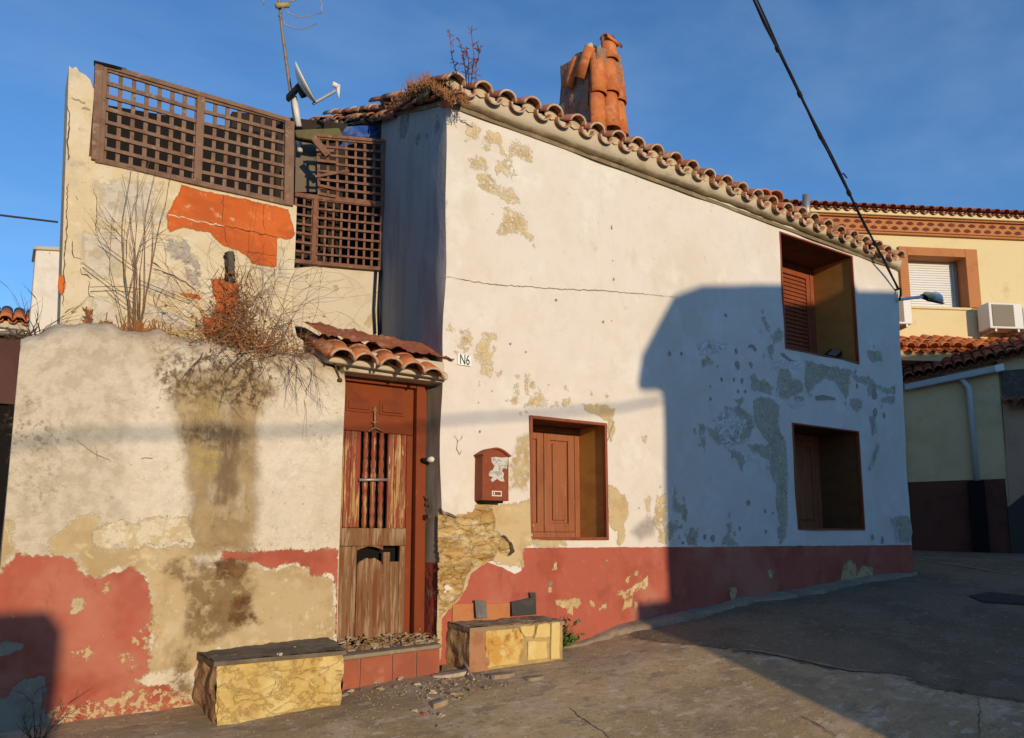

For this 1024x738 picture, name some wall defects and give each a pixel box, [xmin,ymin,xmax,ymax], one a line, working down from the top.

peeling [465,122,535,248]
spalling [81,177,295,337]
crack [445,276,671,297]
peeling [505,373,615,442]
peeling [694,309,896,544]
peeling [0,519,20,569]
peeling [47,513,338,675]
water stain [157,355,272,640]
spalling [437,498,567,659]
spalling [511,562,607,616]
peeling [608,485,741,546]
peeling [0,675,191,732]